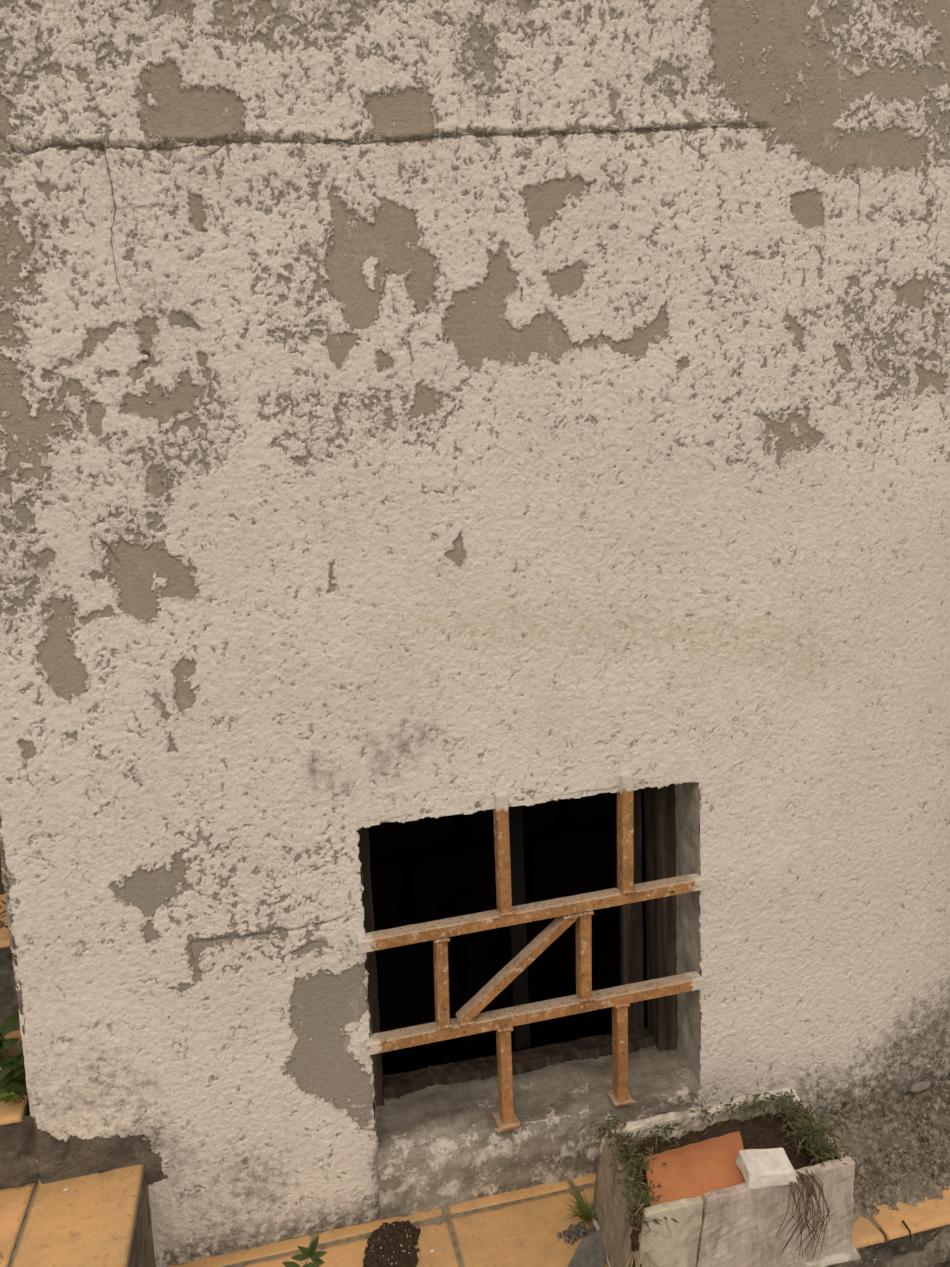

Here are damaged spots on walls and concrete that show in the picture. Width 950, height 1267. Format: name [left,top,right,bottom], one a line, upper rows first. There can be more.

crack [0,123,766,297]
peeling [519,173,590,240]
peeling [790,190,824,229]
peeling [0,203,208,489]
peeling [323,194,440,372]
peeling [442,248,669,371]
peeling [892,272,935,309]
peeling [36,536,198,700]
peeling [109,853,188,943]
peeling [173,926,327,992]
peeling [283,963,374,1129]
damp [800,988,950,1114]